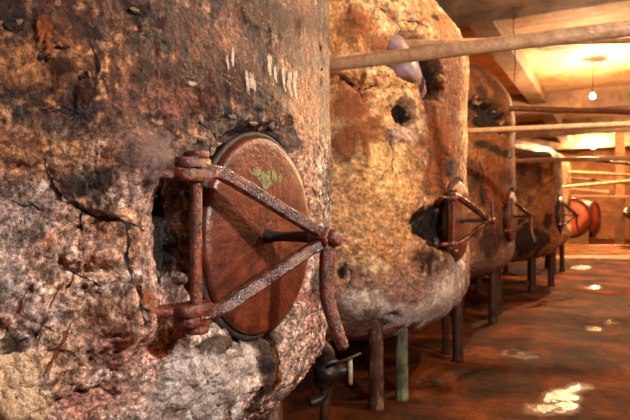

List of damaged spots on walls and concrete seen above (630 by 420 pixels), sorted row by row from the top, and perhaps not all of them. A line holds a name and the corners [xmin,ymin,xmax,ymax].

spalling [391,102,417,127]
crack [4,197,43,225]
crack [44,158,160,326]
spalling [151,189,179,288]
spalling [409,201,443,256]
crack [5,265,100,377]